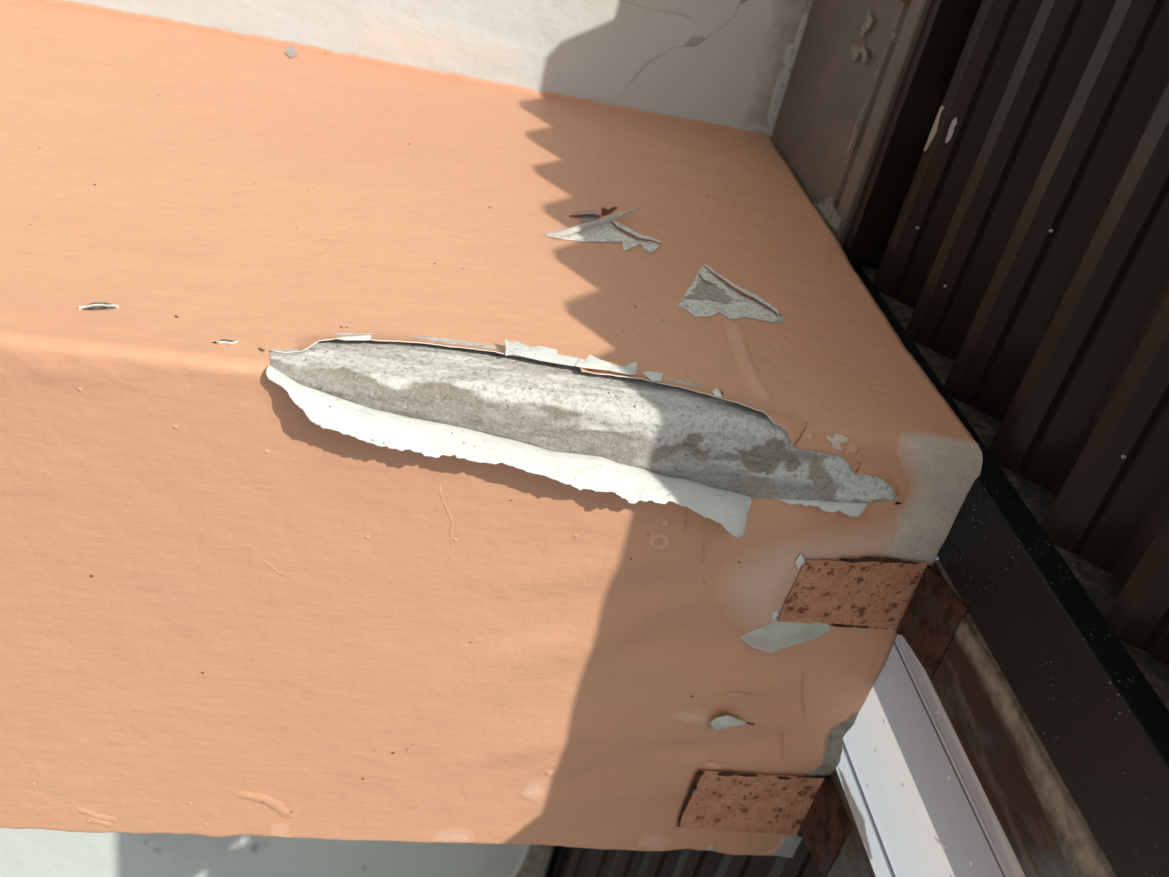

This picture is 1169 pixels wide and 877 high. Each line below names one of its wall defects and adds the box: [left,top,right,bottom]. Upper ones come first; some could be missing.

peeling [544,207,661,253]
peeling [678,264,785,323]
peeling [266,330,983,566]
rust [777,557,928,630]
peeling [741,611,830,653]
peeling [710,715,755,730]
rust [676,770,829,835]